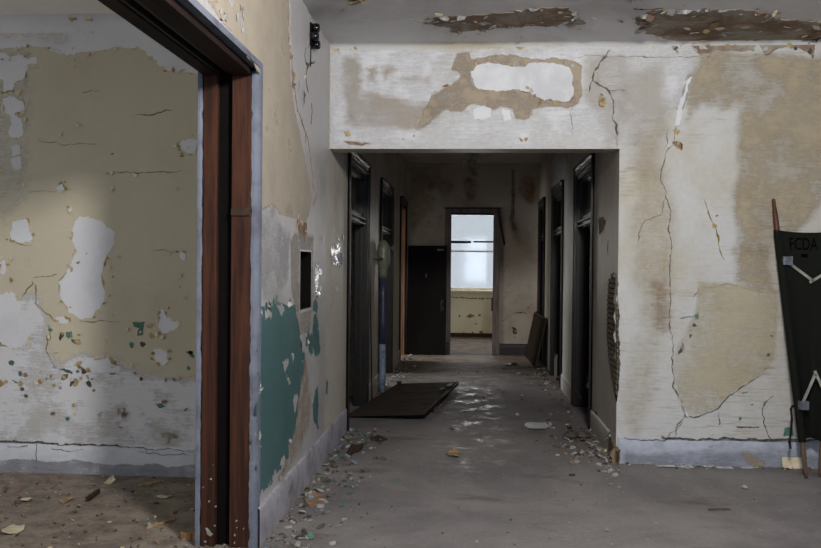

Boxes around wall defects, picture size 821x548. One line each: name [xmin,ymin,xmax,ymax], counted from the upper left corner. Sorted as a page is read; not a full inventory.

peeling [0,31,198,173]
peeling [330,5,821,150]
crack [576,50,700,146]
peeling [0,292,32,350]
peeling [4,217,35,245]
peeling [0,355,122,398]
peeling [46,202,121,353]
peeling [126,307,181,366]
peeling [208,0,328,494]
peeling [323,228,344,268]
crack [624,134,816,442]
crack [0,440,195,471]